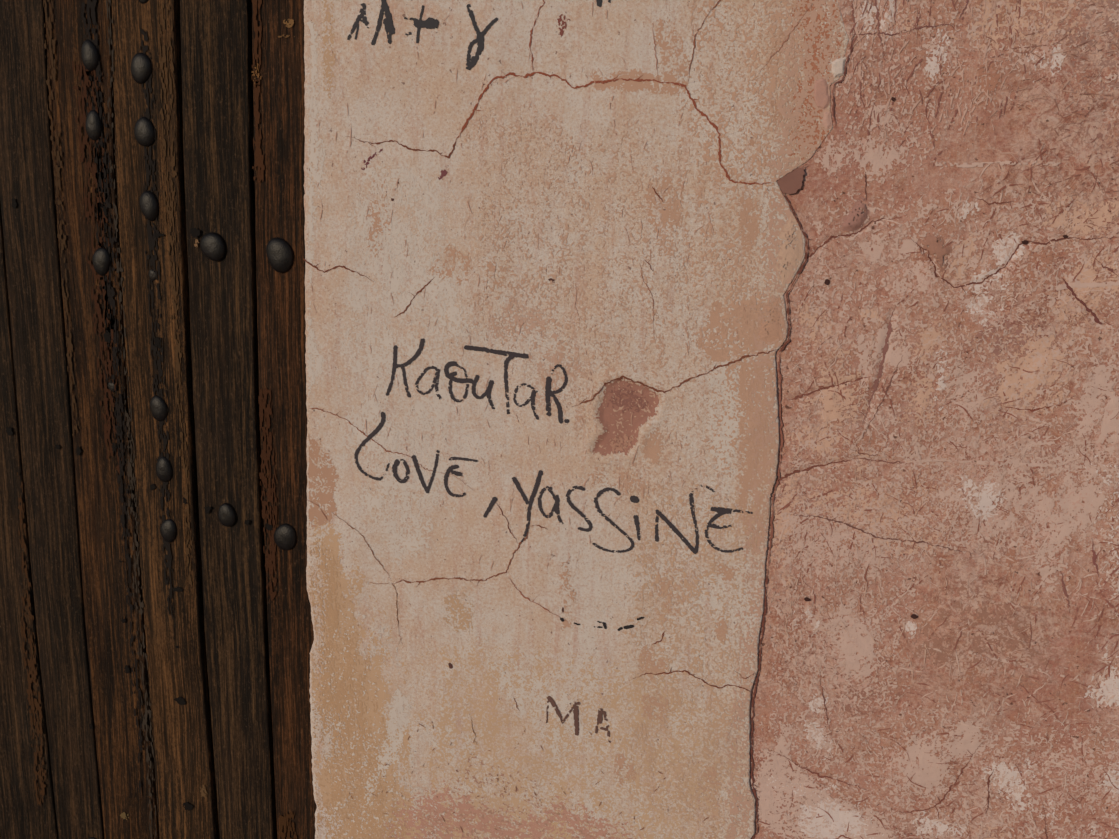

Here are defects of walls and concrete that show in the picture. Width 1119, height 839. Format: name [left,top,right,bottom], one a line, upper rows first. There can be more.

spalling [777,167,805,194]
crack [304,259,374,282]
crack [310,408,469,487]
spalling [593,378,659,457]
crack [348,0,1119,839]
crack [308,500,558,645]